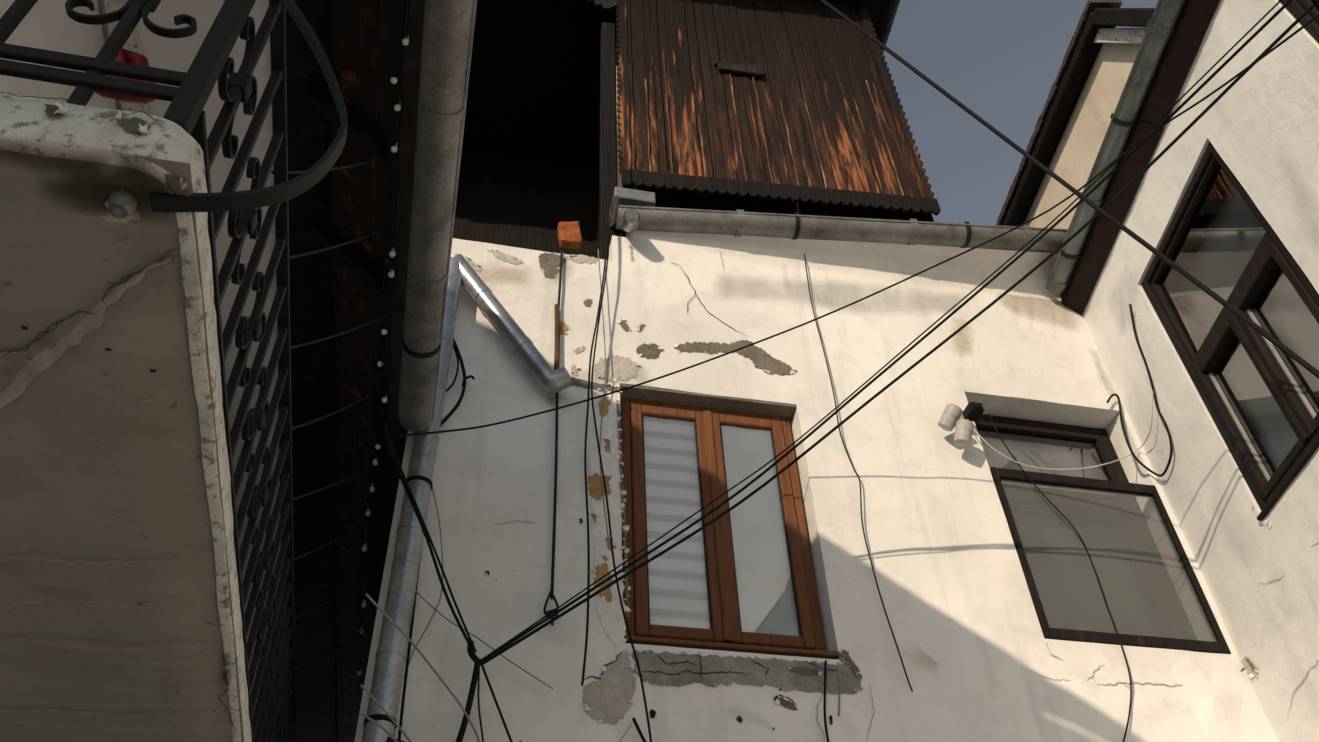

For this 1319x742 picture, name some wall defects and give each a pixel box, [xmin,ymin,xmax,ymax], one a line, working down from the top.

peeling [44,99,68,116]
peeling [114,110,151,133]
crack [0,238,188,357]
spalling [487,247,598,278]
crack [674,263,749,337]
spalling [560,319,863,711]